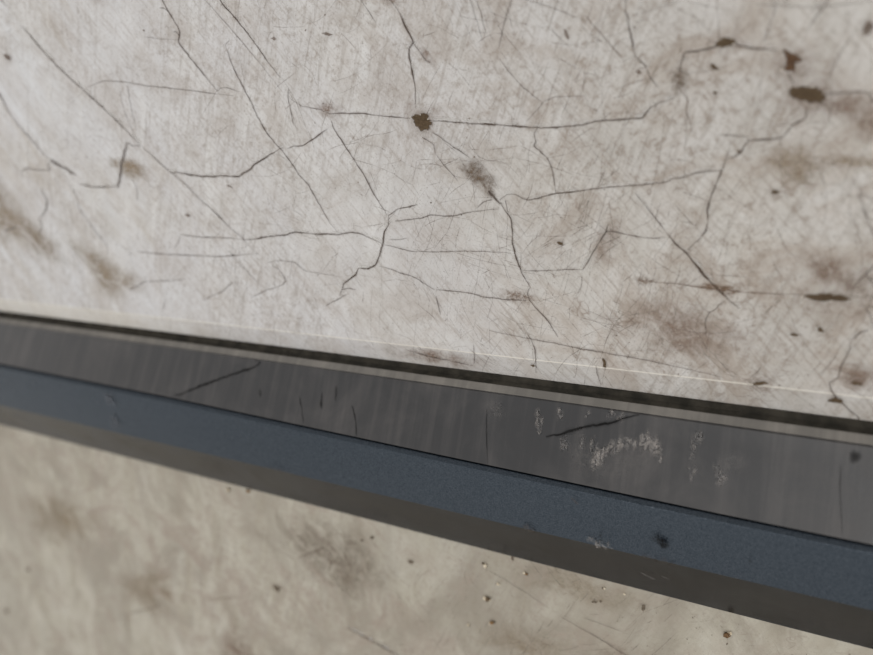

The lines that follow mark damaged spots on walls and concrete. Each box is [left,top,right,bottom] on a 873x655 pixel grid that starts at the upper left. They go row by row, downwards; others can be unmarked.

crack [23,34,138,188]
crack [162,0,206,93]
crack [220,0,268,62]
crack [143,14,807,329]
corrosion [781,48,803,72]
crack [829,267,873,420]